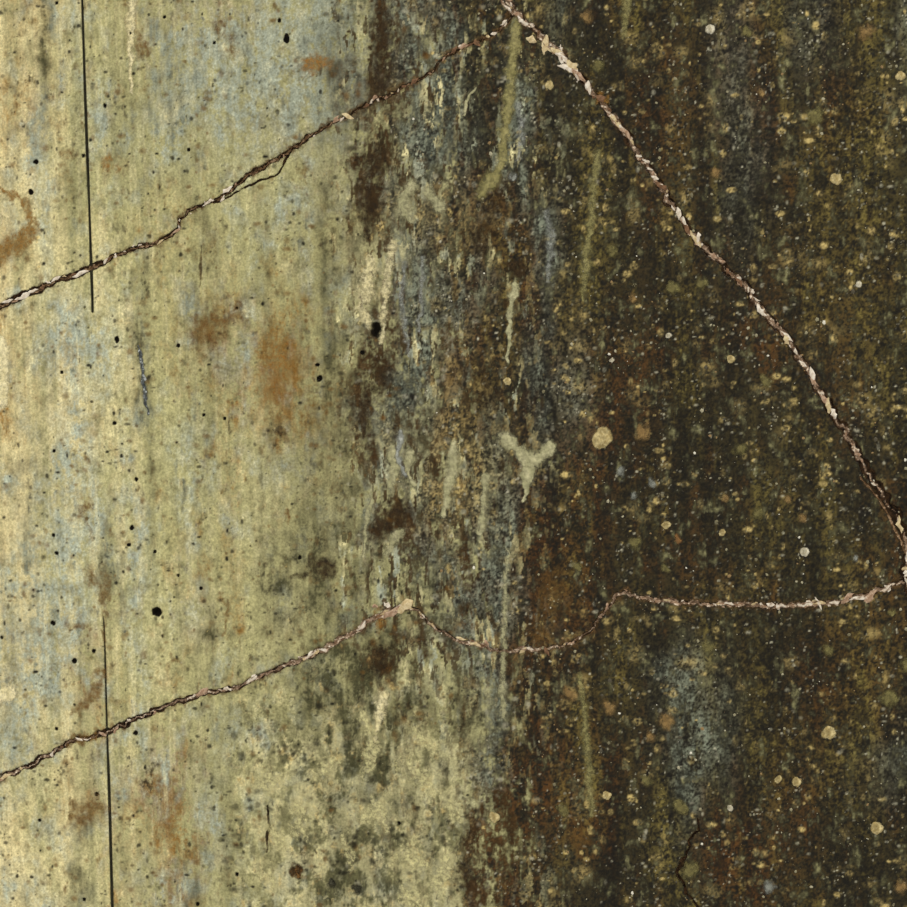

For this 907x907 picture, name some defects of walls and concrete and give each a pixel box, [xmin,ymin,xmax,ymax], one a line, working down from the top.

leakage [366,7,394,99]
leakage [478,20,523,216]
leakage [621,0,631,35]
leakage [349,142,389,240]
leakage [580,150,600,301]
crack [0,0,907,656]
leakage [505,258,529,363]
leakage [362,493,415,558]
leakage [498,550,510,717]
crack [0,599,542,907]
leakage [373,691,388,743]
leakage [578,673,594,817]